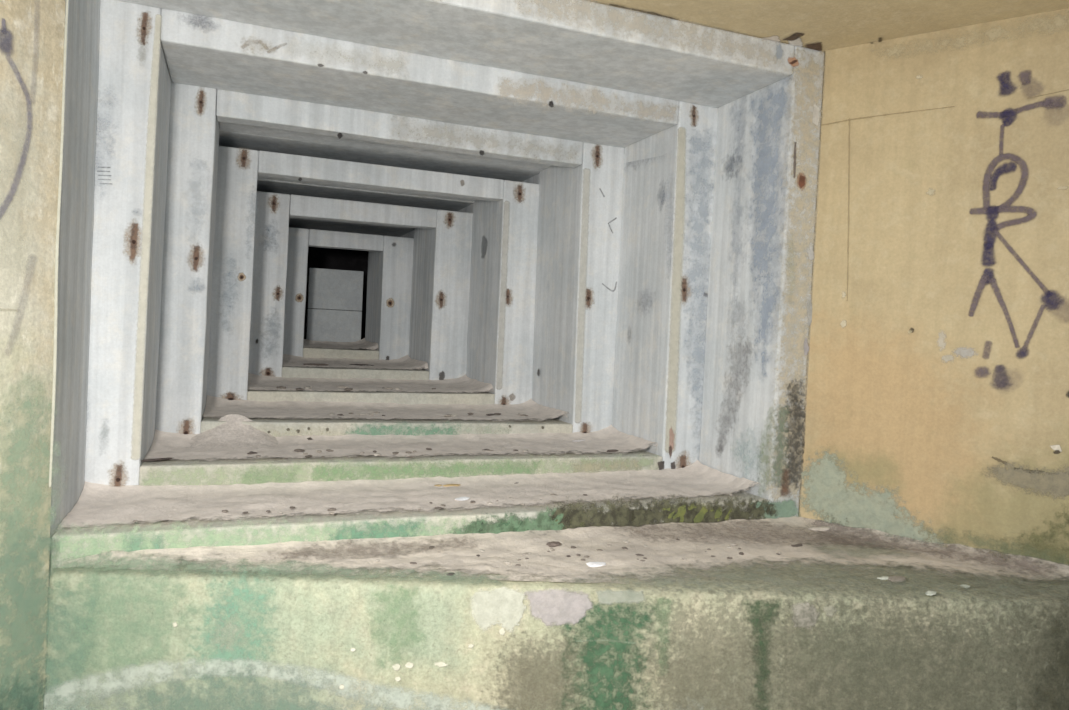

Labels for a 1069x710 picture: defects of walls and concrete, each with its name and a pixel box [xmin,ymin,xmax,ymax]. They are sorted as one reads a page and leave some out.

rust [139,13,151,45]
rust [197,91,205,113]
rust [592,146,602,168]
rust [794,142,806,189]
rust [126,224,140,261]
rust [190,246,203,271]
water stain [752,88,786,363]
water stain [773,380,805,495]
rust [111,465,125,487]
water stain [43,580,500,710]
water stain [563,602,659,710]